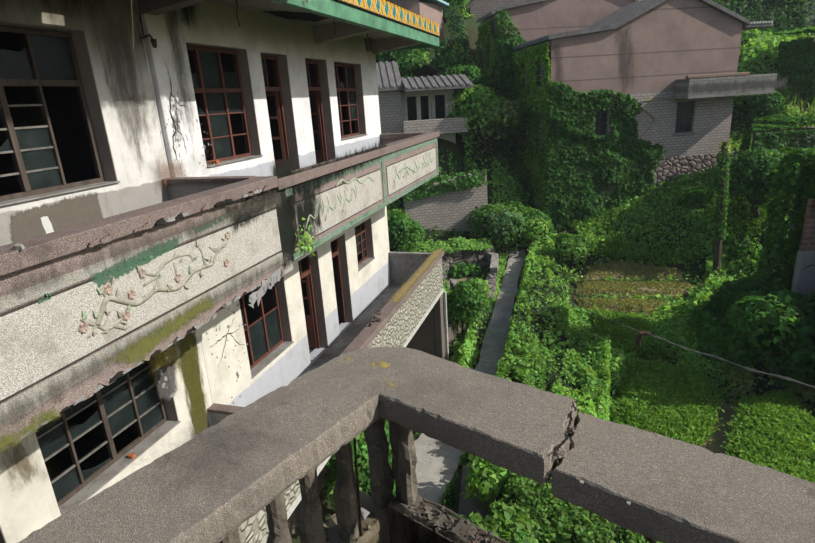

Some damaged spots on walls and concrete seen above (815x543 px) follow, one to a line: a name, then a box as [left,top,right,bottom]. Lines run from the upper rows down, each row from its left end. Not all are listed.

crack [165,62,187,168]
peeling [0,185,269,312]
peeling [0,252,284,428]
leakage [150,341,180,370]
leakage [5,444,32,479]
spalling [0,396,85,451]
crack [546,399,578,482]